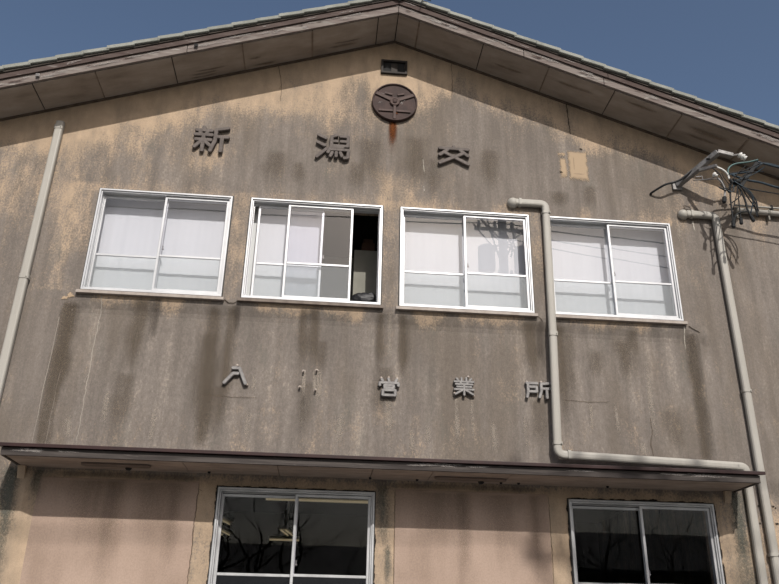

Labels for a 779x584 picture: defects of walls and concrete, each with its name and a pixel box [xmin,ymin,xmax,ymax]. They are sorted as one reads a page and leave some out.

damp [38,304,74,442]
crack [76,295,106,441]
damp [377,315,405,361]
damp [557,328,566,389]
damp [684,326,708,457]
damp [0,468,17,548]